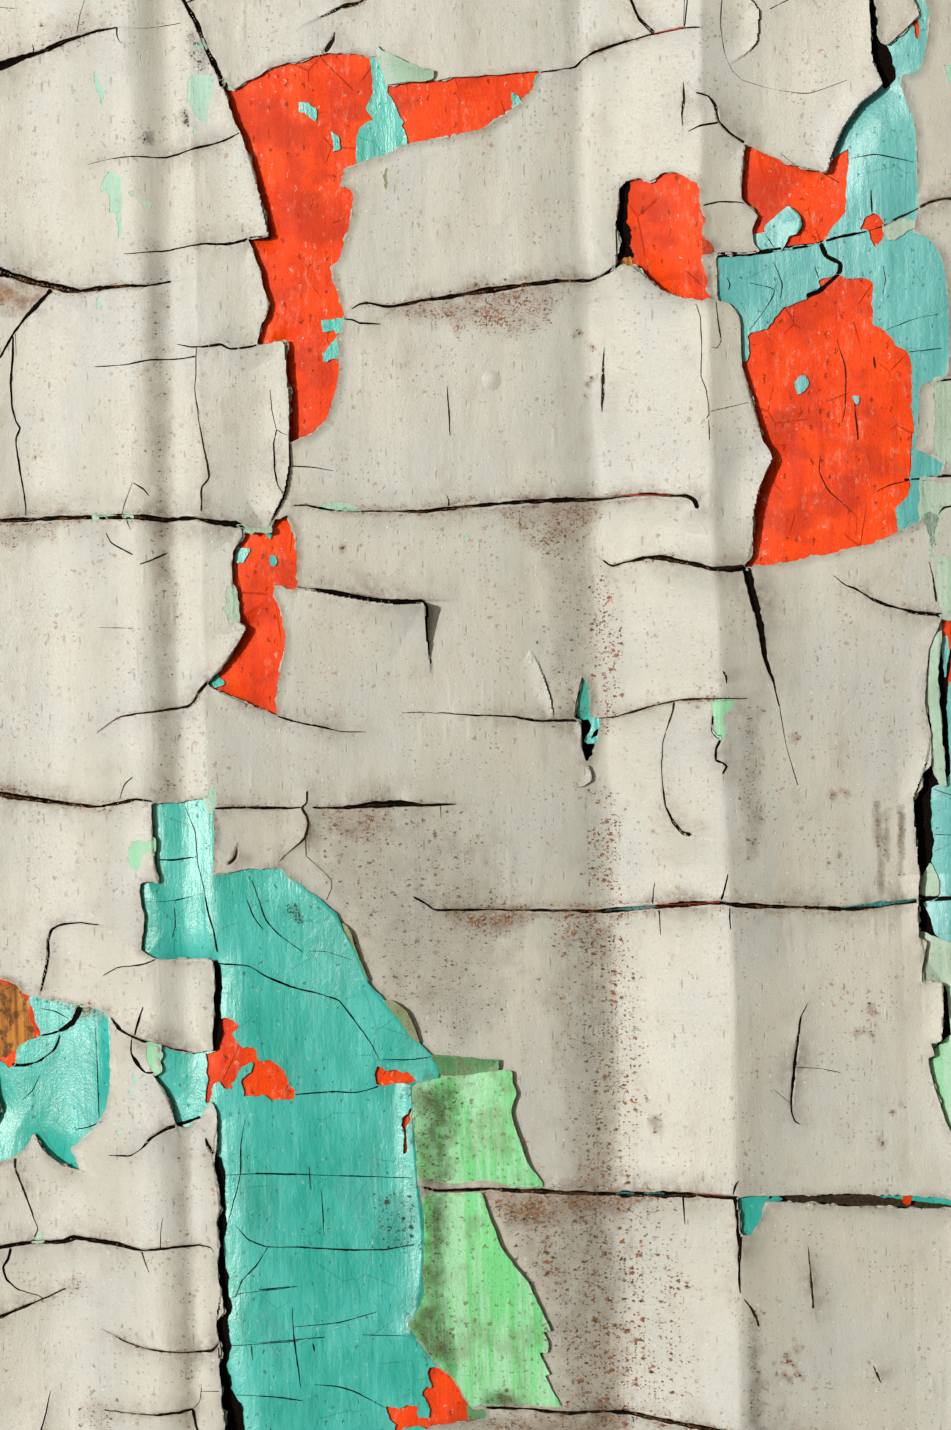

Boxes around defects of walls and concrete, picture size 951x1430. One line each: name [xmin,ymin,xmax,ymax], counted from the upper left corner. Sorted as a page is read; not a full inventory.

crack [0,0,228,87]
corrosion [0,282,37,317]
crack [0,236,270,564]
peeling [187,45,540,448]
peeling [209,514,298,715]
crack [406,553,798,836]
peeling [613,0,951,1131]
crack [414,874,951,935]
peeling [0,979,111,1169]
peeling [127,787,561,1430]
crack [0,922,767,1430]
peeling [737,1193,951,1235]